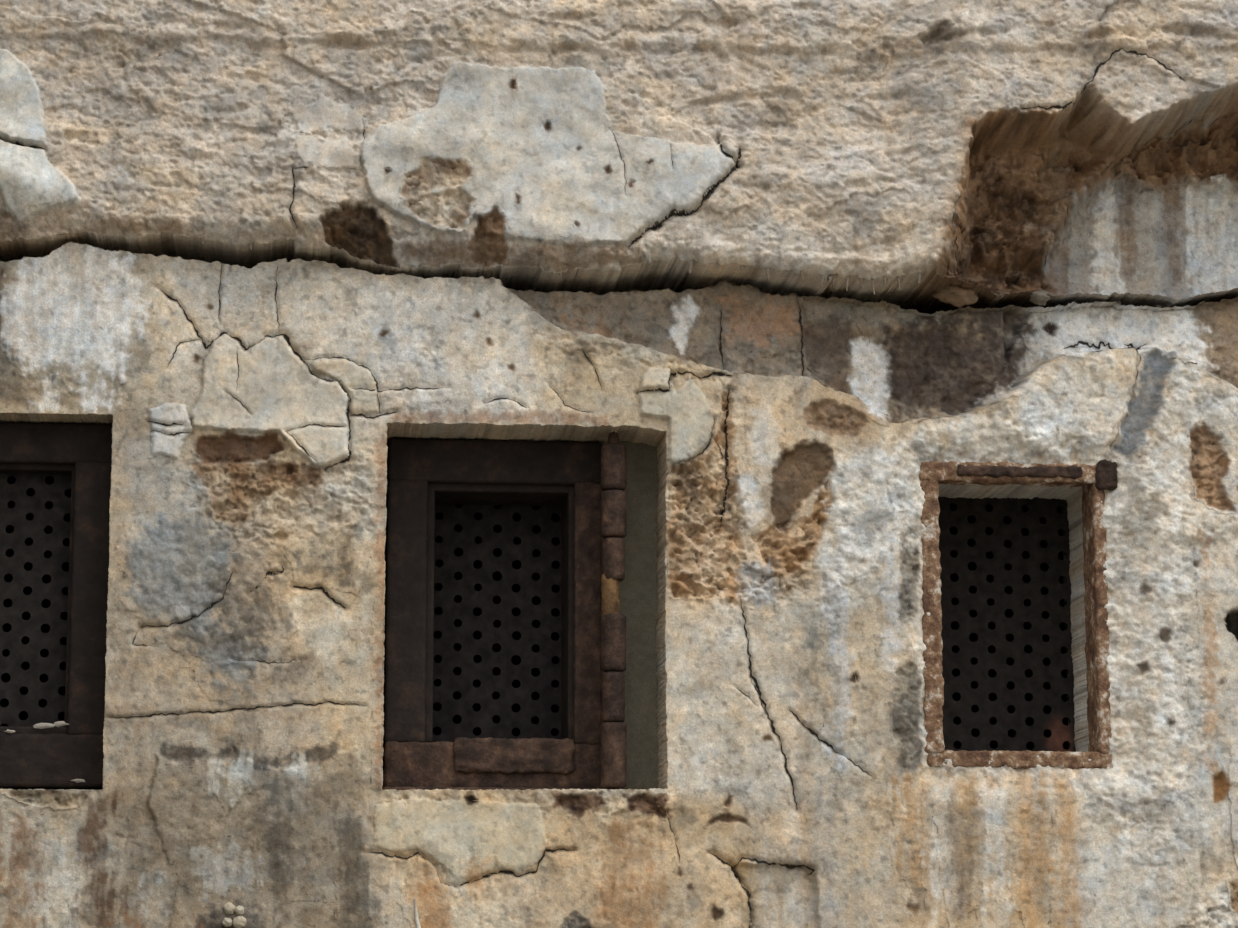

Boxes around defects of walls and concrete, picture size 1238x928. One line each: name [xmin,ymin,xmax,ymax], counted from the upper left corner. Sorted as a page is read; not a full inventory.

spalling [952,105,1063,294]
crack [156,265,449,470]
spalling [147,402,327,531]
spalling [666,388,872,602]
leakage [802,162,1238,928]
spalling [1187,419,1238,514]
crack [733,599,797,808]
leakage [0,736,345,928]
leakage [325,793,504,928]
crack [366,848,569,886]
leakage [581,806,678,928]
crack [711,853,815,928]